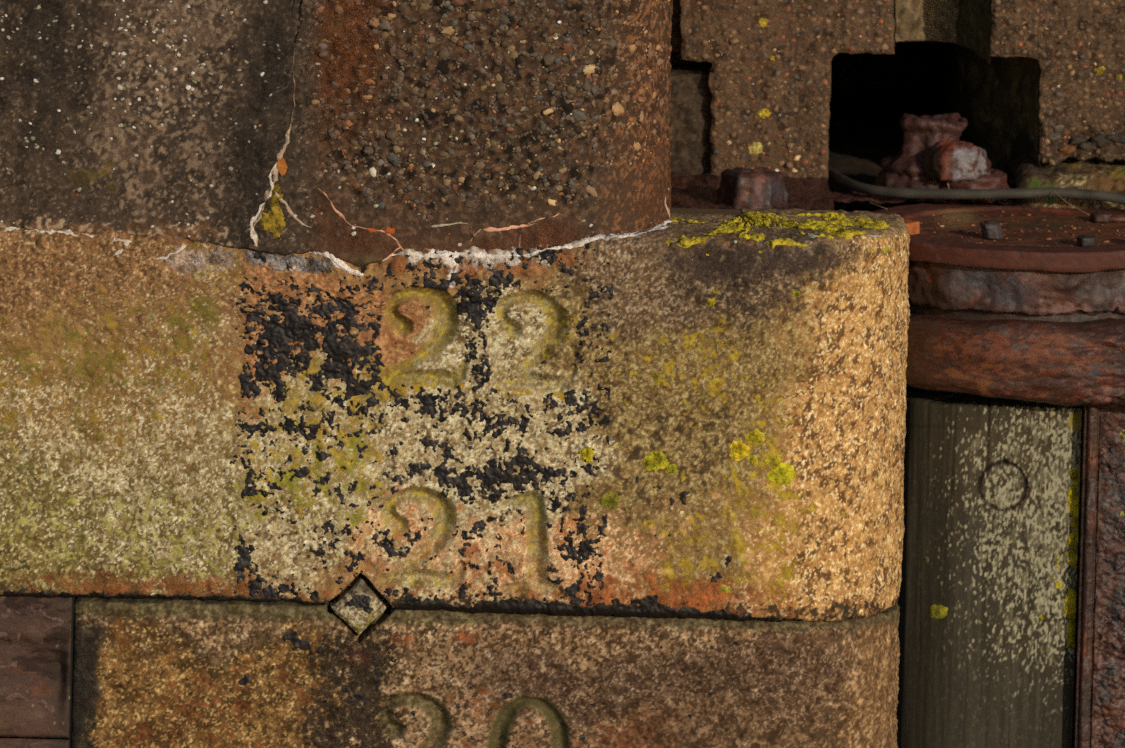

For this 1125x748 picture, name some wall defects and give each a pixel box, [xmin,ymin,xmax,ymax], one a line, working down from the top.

crack [239,0,309,247]
crack [318,188,404,259]
crack [431,213,559,248]